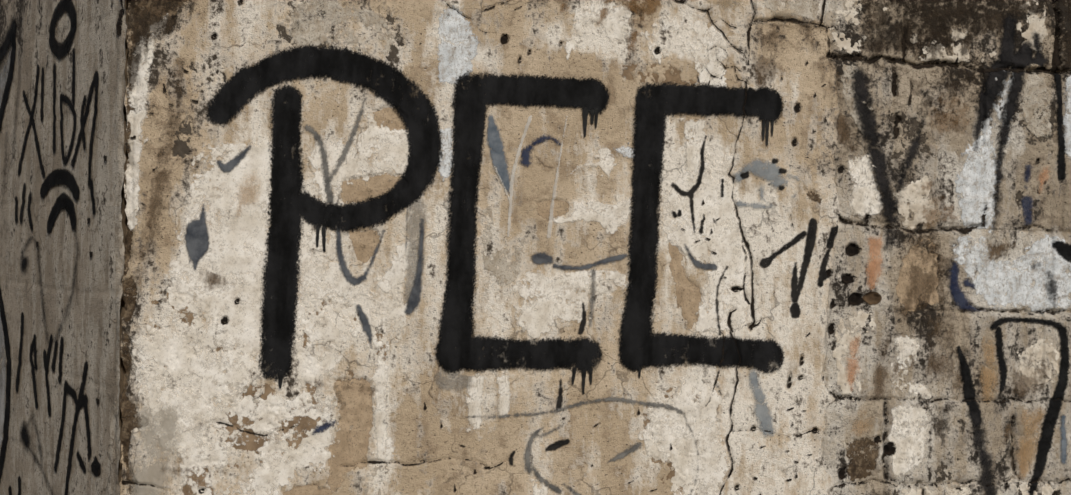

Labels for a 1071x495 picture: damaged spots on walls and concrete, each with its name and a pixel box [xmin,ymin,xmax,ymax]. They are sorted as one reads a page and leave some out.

crack [442,0,550,33]
water stain [862,0,1042,55]
peeling [910,29,997,64]
peeling [830,0,942,230]
peeling [953,72,1071,314]
crack [675,0,837,494]
spalling [846,244,862,256]
spalling [896,238,939,312]
peeling [827,270,882,401]
peeling [1016,338,1060,404]
peeling [839,335,971,495]
peeling [1001,481,1062,495]